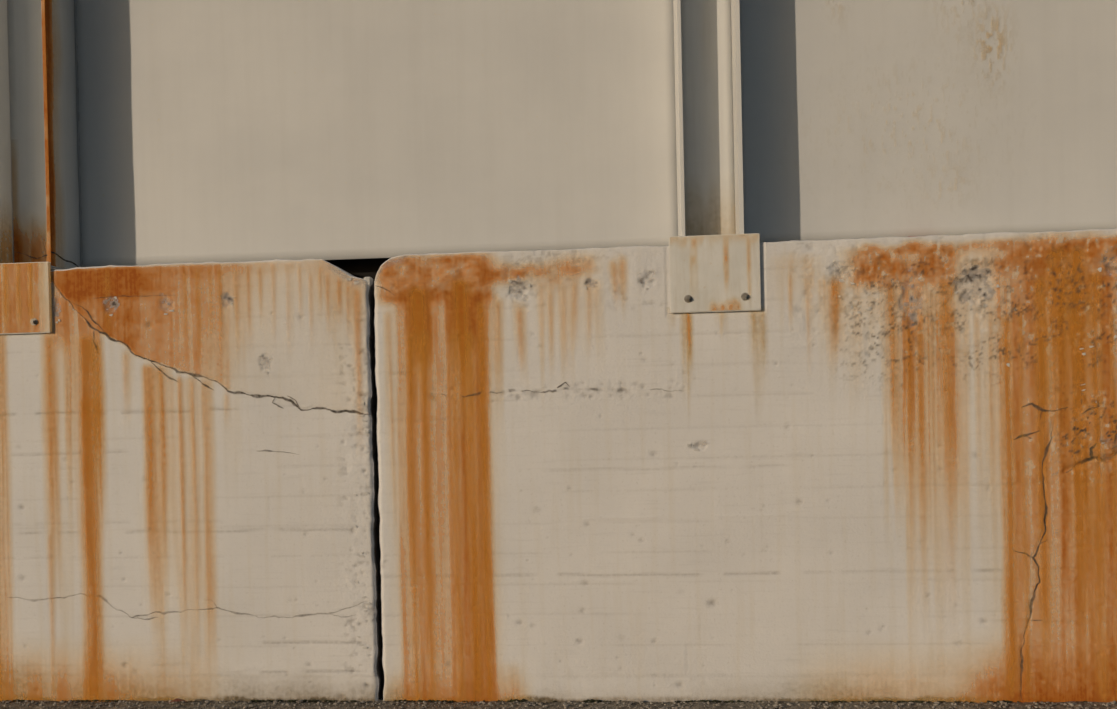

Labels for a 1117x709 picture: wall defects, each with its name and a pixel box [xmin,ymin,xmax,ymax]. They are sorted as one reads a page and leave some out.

corrosion [0,0,237,702]
crack [17,251,371,415]
corrosion [380,255,546,703]
corrosion [854,237,1117,703]
crack [1012,403,1097,699]
crack [1083,443,1117,462]